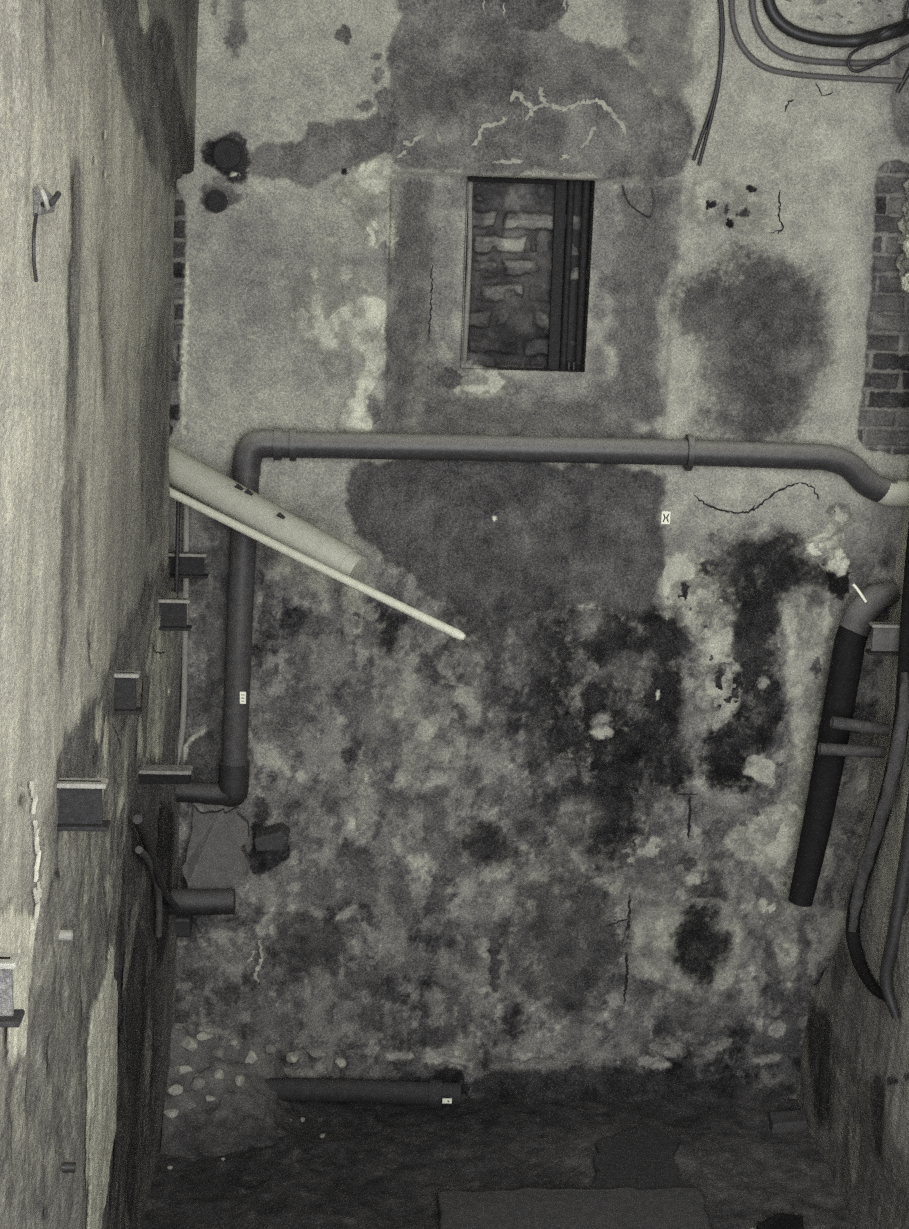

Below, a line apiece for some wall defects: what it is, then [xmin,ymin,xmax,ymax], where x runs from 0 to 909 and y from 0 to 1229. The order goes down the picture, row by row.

water stain [106,0,195,192]
water stain [248,91,396,187]
flaking render [891,34,909,145]
water stain [61,159,86,674]
water stain [672,241,832,442]
flaking render [858,160,909,455]
water stain [346,460,849,1019]
water stain [472,998,909,1229]